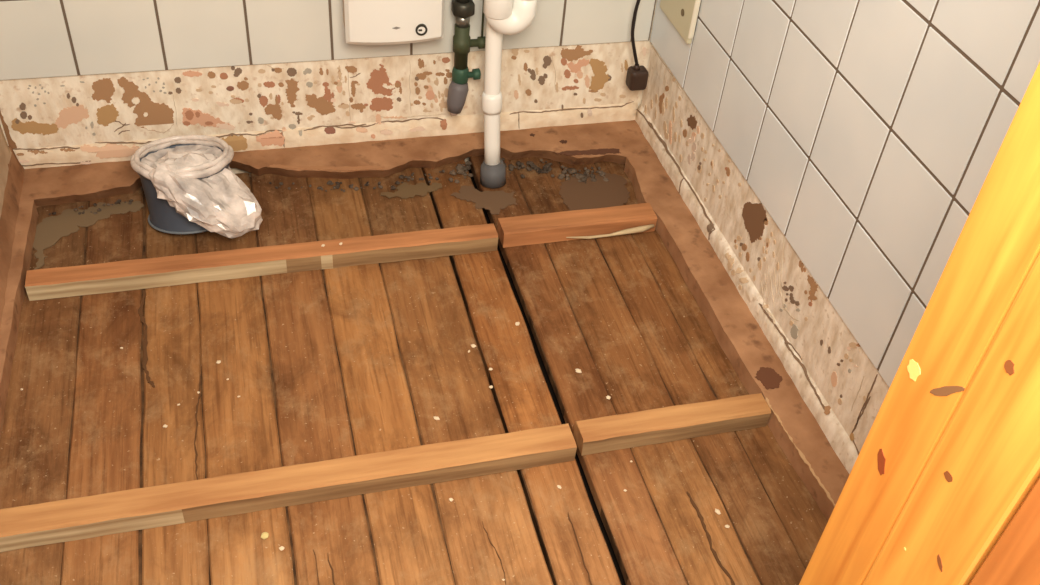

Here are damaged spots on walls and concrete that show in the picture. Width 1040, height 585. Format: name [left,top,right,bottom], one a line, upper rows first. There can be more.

spalling [11,103,59,136]
spalling [92,77,182,133]
spalling [208,66,366,124]
spalling [414,58,452,106]
spalling [511,45,612,103]
water stain [380,182,518,215]
water stain [559,171,630,211]
water stain [33,201,144,270]
spalling [734,202,769,262]
spalling [782,261,818,306]
crack [758,239,825,410]
crack [851,374,878,455]